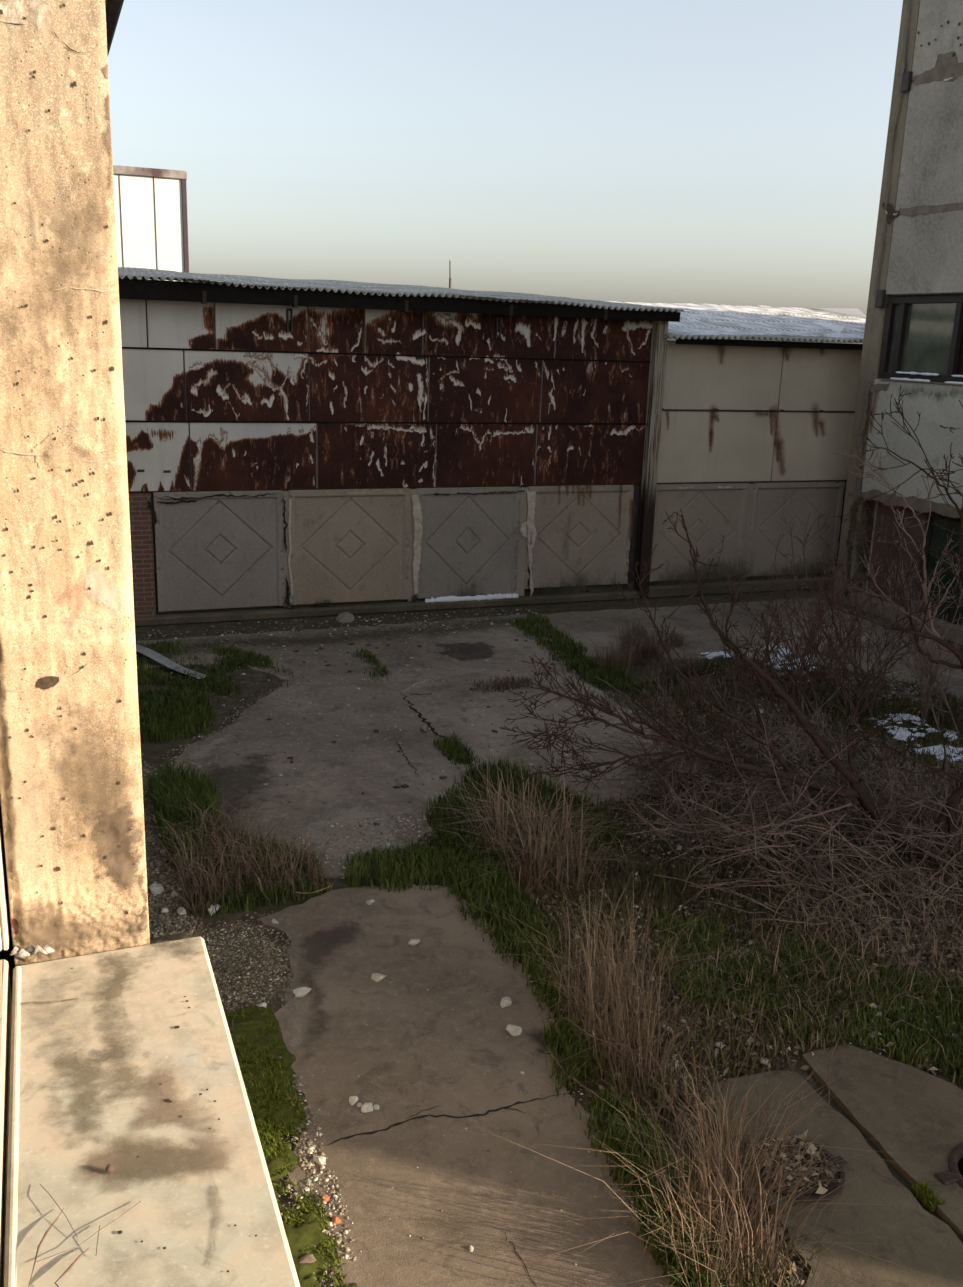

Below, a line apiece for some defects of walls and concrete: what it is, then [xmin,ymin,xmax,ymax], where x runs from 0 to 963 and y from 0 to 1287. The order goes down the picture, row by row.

spalling [874,0,963,296]
corrosion [126,305,653,539]
corrosion [710,407,719,451]
corrosion [758,410,784,474]
crack [400,677,468,760]
water stain [55,730,127,821]
water stain [15,908,143,958]
water stain [22,955,228,1182]
crack [316,1095,556,1148]